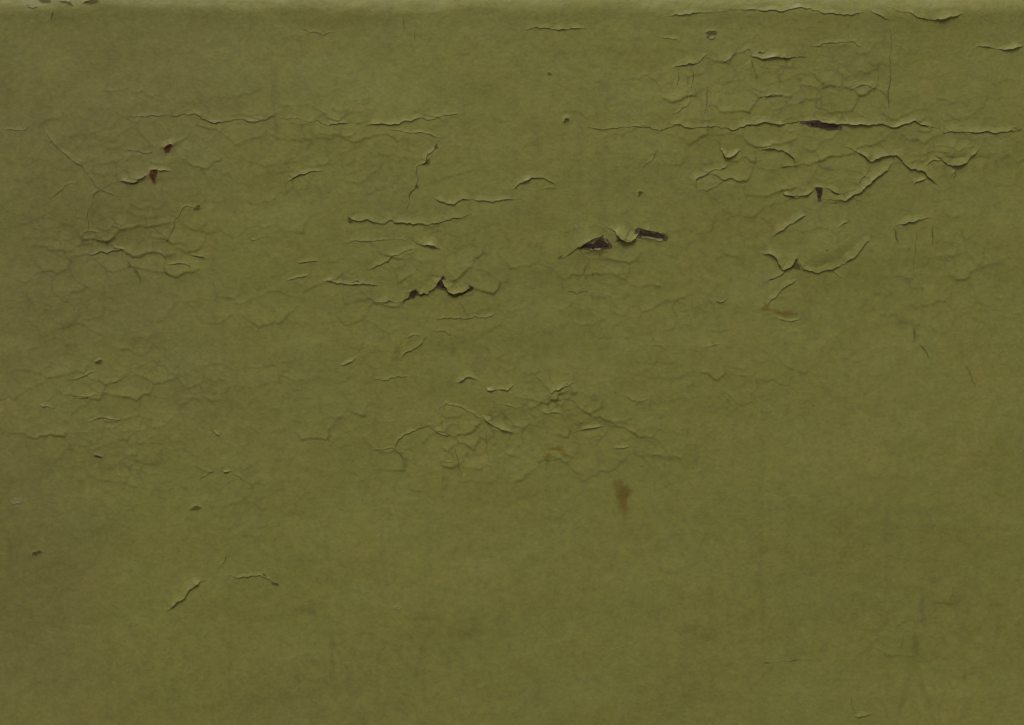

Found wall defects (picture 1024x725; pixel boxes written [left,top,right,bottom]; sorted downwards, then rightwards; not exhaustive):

peeling [782,157,895,203]
crack [82,188,143,284]
peeling [559,221,668,259]
peeling [376,275,475,303]
crack [439,371,630,462]